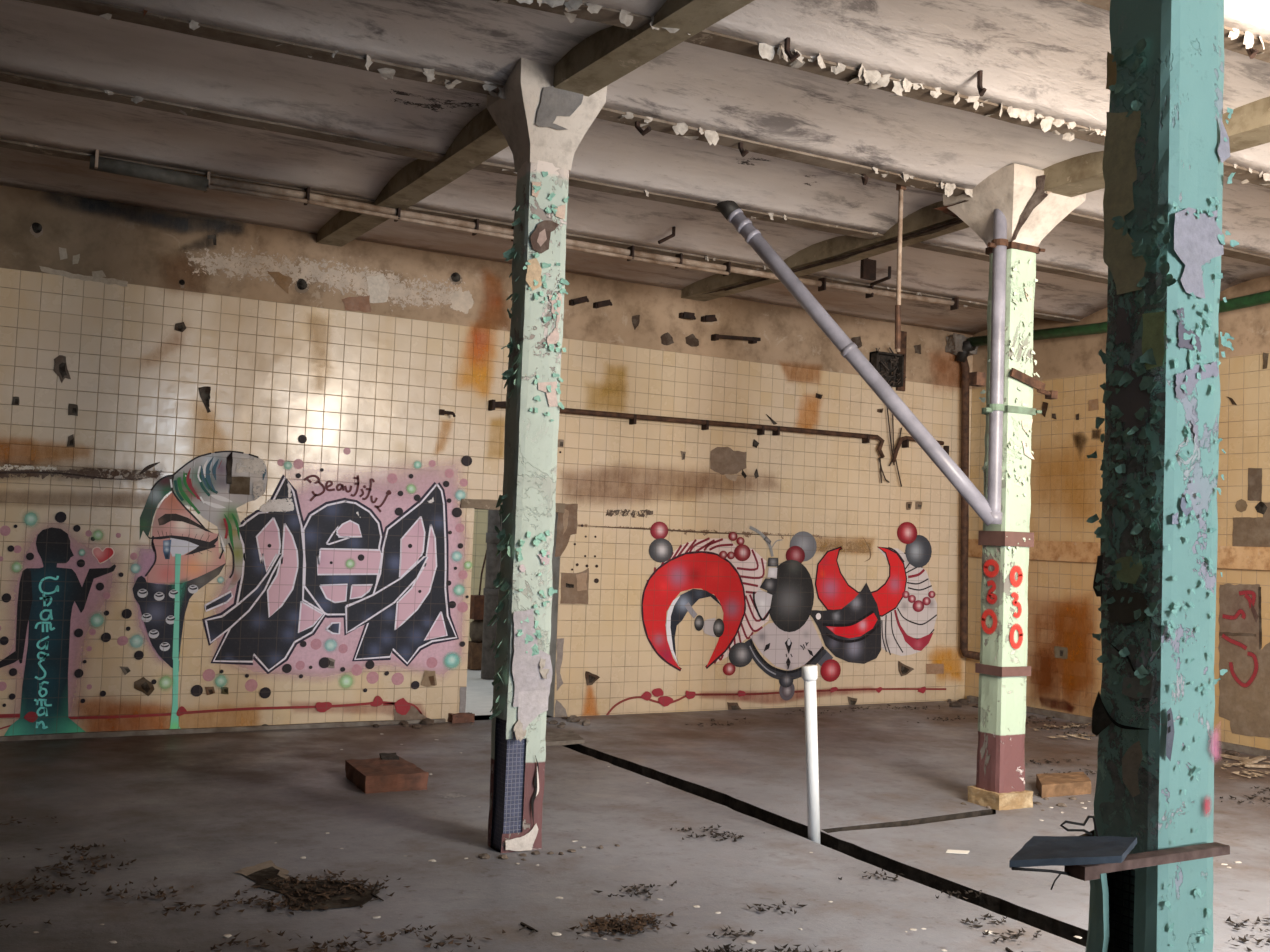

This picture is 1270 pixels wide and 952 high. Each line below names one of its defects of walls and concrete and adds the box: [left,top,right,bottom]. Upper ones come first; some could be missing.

peeling [495,0,602,23]
peeling [619,9,633,26]
peeling [365,55,396,80]
peeling [423,68,461,89]
spalling [535,86,584,130]
peeling [619,112,653,127]
peeling [672,123,719,146]
spalling [503,171,570,352]
peeling [179,245,474,314]
peeling [501,336,520,398]
peeling [758,38,1270,737]
spalling [505,824,538,851]